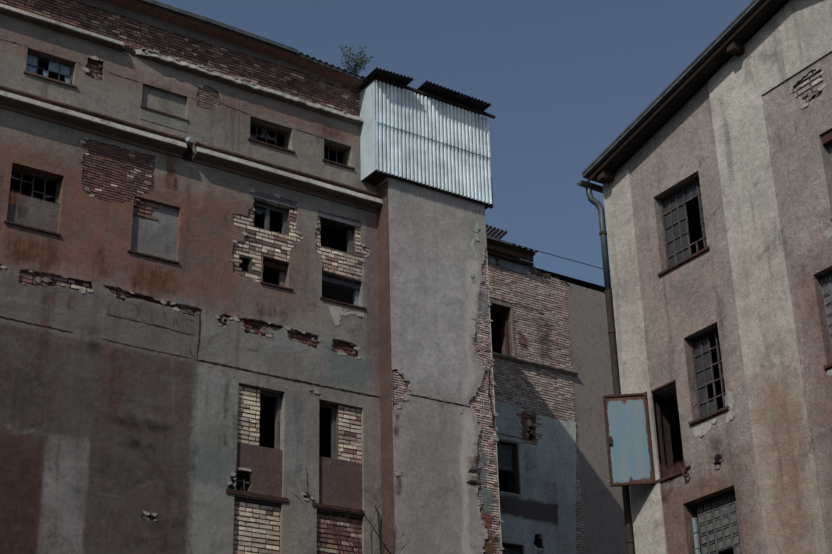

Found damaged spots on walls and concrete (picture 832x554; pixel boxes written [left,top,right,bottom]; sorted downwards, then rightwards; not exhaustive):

spalling [196,84,220,110]
spalling [789,68,827,109]
spalling [80,137,159,221]
spalling [230,189,304,281]
spalling [314,210,369,280]
spalling [18,271,94,294]
spalling [104,286,201,316]
spalling [215,314,321,348]
spalling [331,339,361,359]
spalling [391,370,411,410]
spalling [469,221,505,554]